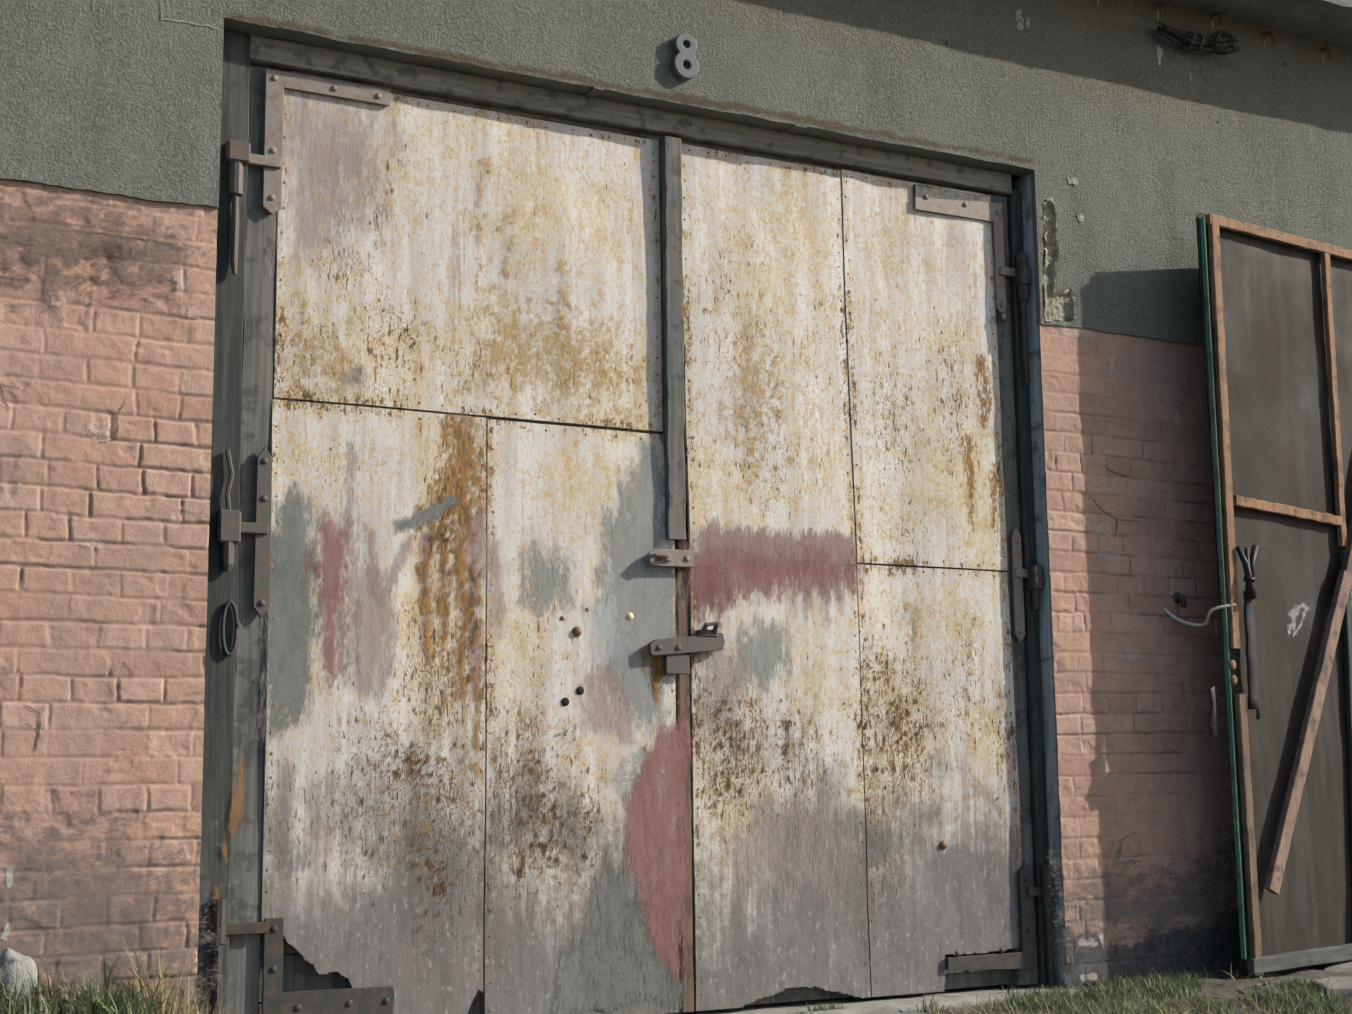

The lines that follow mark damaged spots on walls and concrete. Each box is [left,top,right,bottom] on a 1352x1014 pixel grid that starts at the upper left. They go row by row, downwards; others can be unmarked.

crack [161,1,219,29]
damp [4,232,157,312]
spalling [1043,197,1102,341]
crack [0,384,21,411]
crack [100,400,126,442]
corrosion [975,354,993,427]
corrosion [959,435,1010,551]
corrosion [321,412,634,965]
corrosion [641,651,792,830]
corrosion [841,602,941,834]
damp [0,812,224,1014]
damp [1050,828,1242,991]